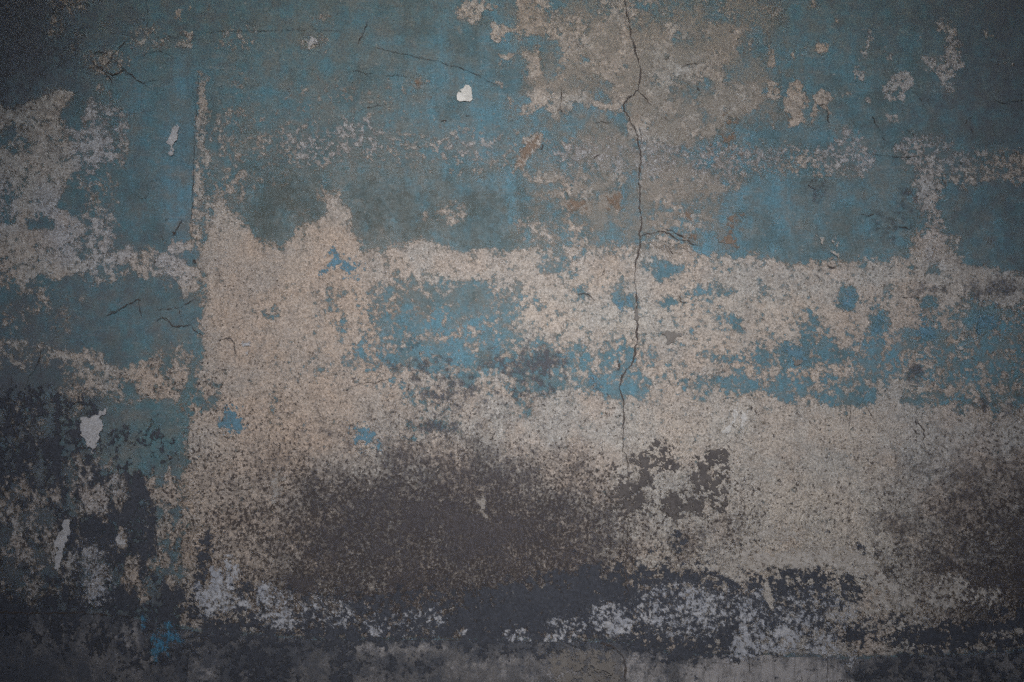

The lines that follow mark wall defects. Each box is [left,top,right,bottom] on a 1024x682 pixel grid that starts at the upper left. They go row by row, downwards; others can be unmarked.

peeling [455,0,498,25]
spalling [453,85,472,107]
peeling [882,46,914,122]
peeling [920,18,965,96]
spalling [166,124,179,156]
peeling [252,112,503,171]
peeling [422,200,468,226]
crack [595,0,698,594]
damp [0,346,1024,682]